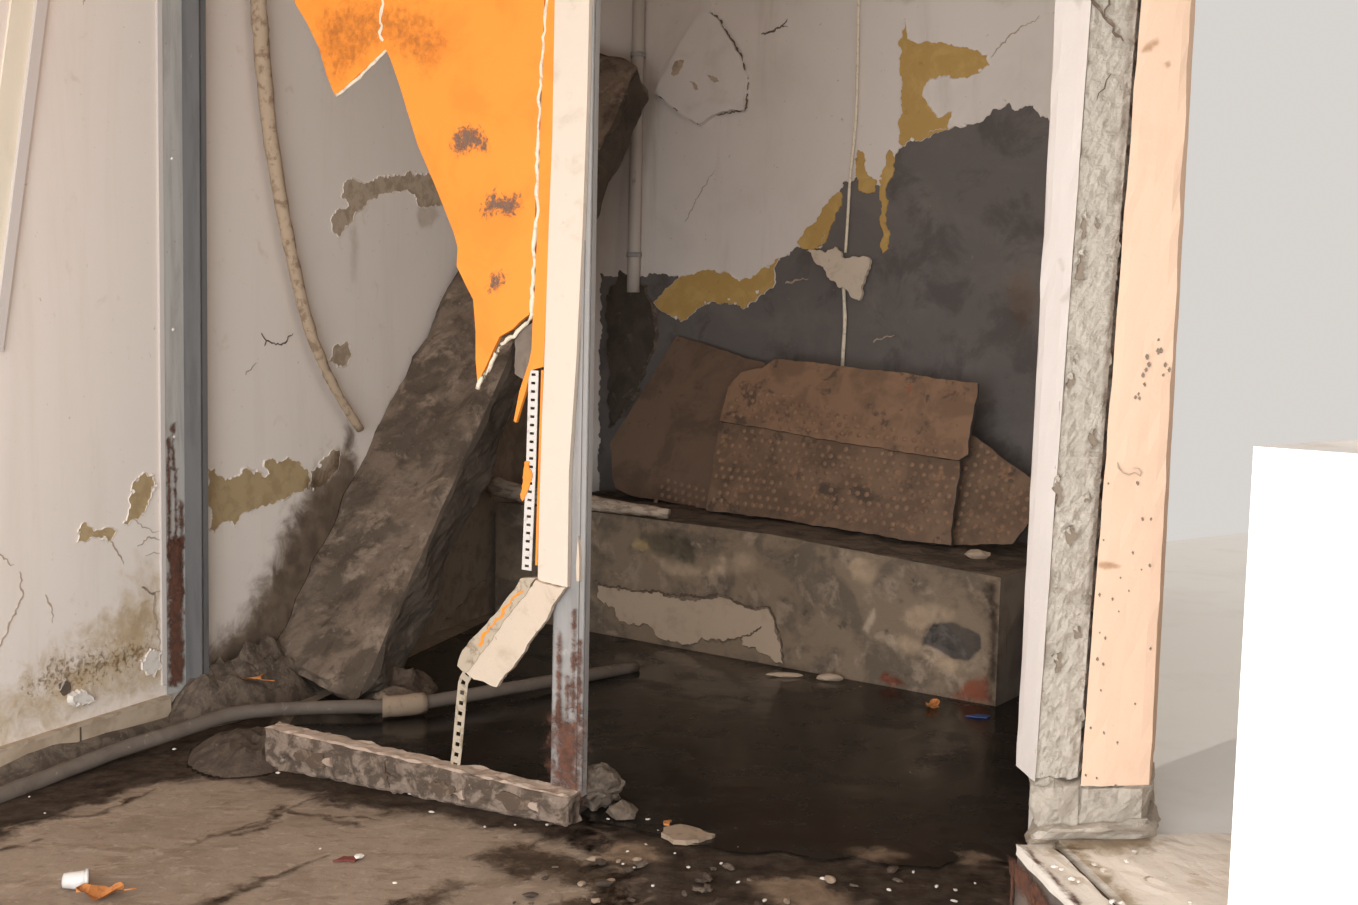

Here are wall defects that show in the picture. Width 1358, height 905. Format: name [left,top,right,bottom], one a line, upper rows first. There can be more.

peeling [330,171,443,238]
peeling [596,19,1050,491]
peeling [76,471,157,544]
peeling [208,449,341,533]
crack [0,554,54,647]
corrosion [166,424,185,687]
spalling [596,585,785,666]
corrosion [546,609,584,797]